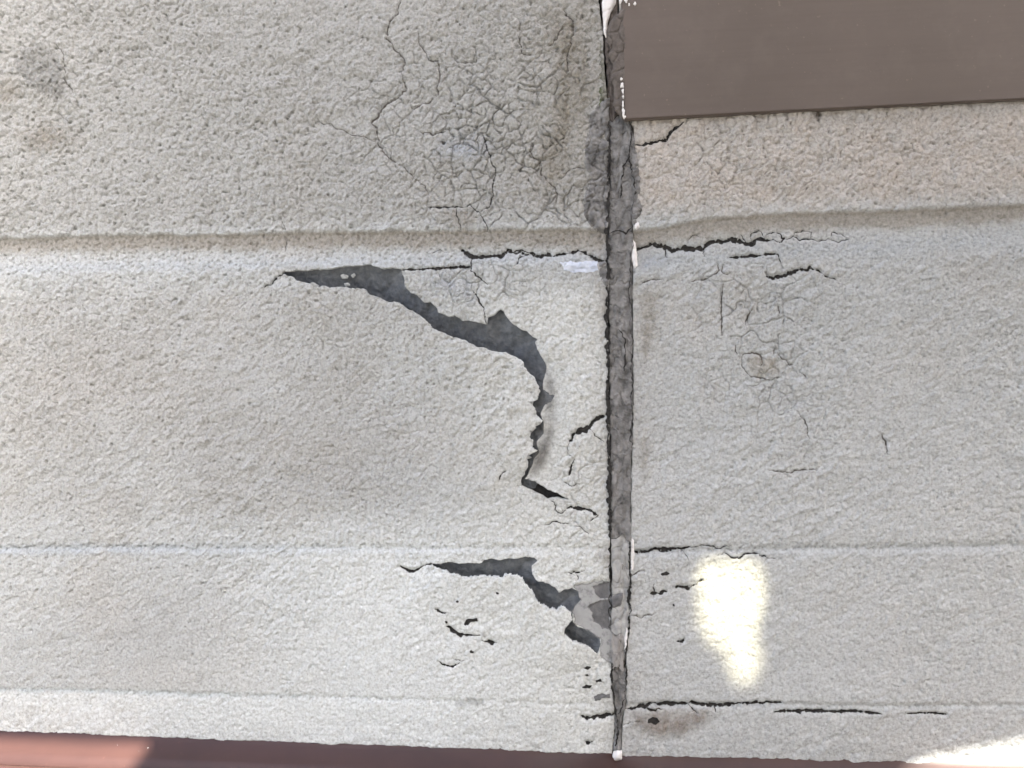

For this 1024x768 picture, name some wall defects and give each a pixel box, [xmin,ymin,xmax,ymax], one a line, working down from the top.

spalling [285,265,565,498]
crack [322,2,881,746]
spalling [433,557,625,663]
crack [907,709,946,717]